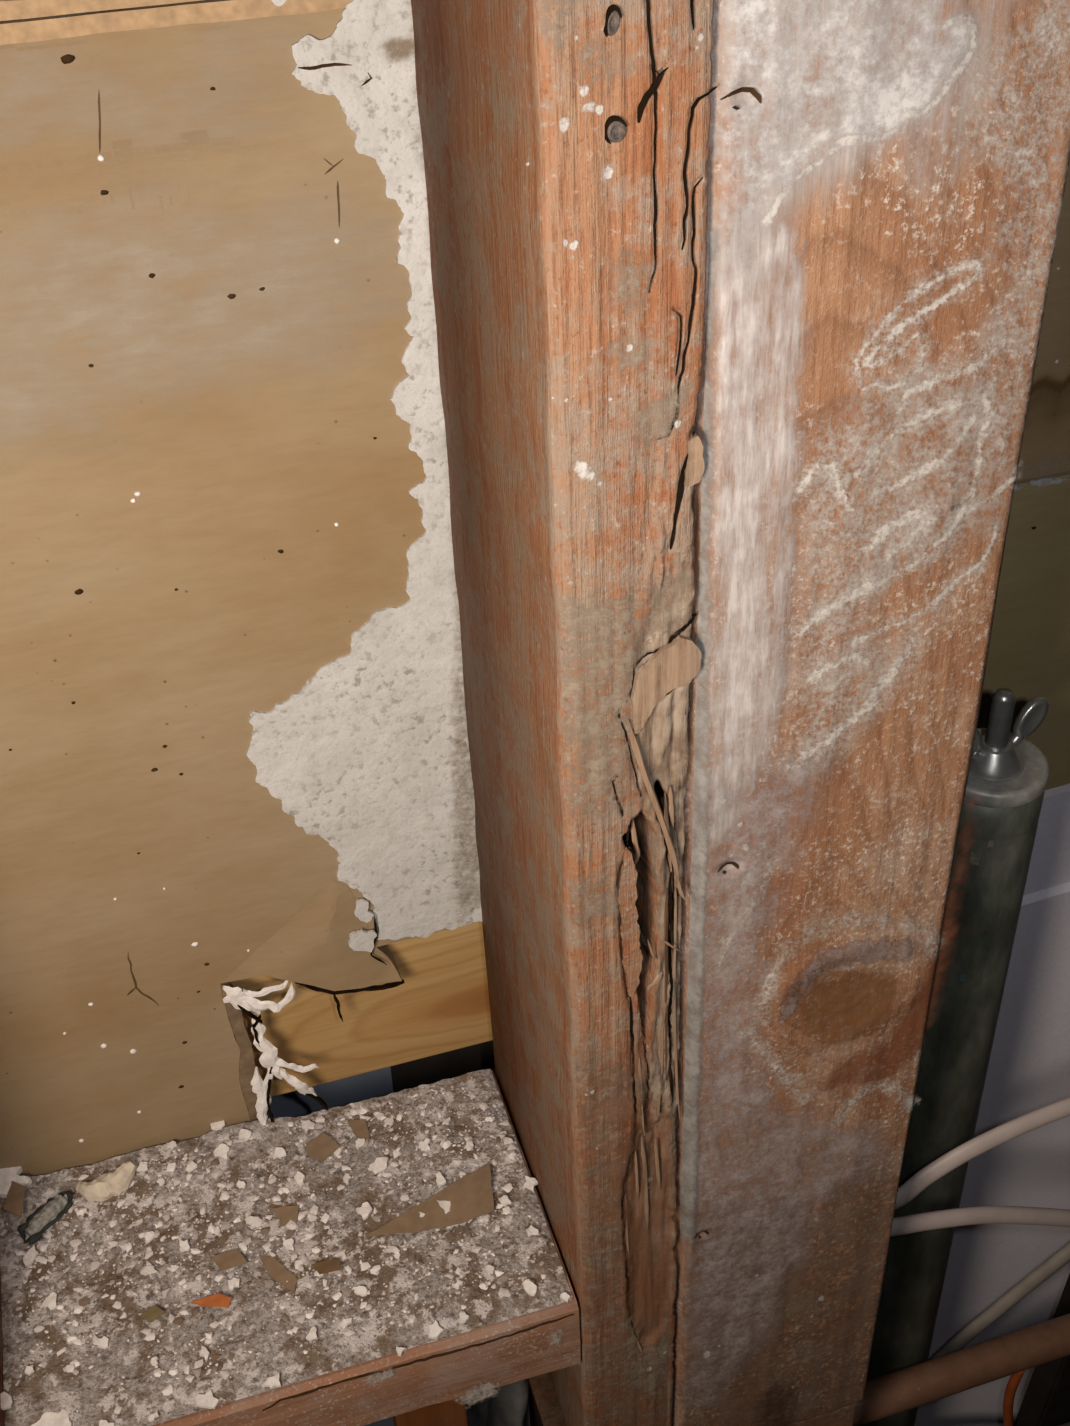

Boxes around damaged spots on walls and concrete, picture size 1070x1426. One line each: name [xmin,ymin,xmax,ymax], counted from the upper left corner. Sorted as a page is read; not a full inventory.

flaking render [246,0,482,953]
crack [637,0,717,550]
water stain [706,0,1017,843]
crack [370,915,387,965]
crack [611,613,696,1354]
water stain [759,914,955,1125]